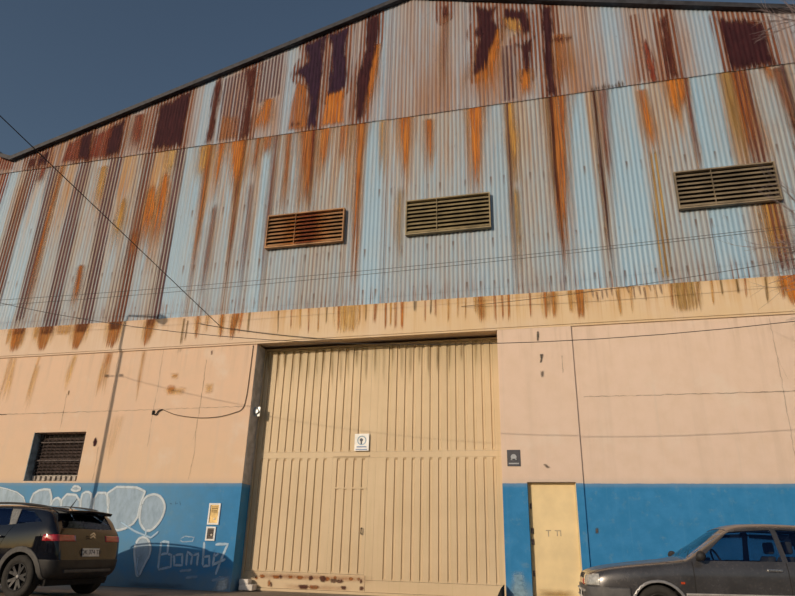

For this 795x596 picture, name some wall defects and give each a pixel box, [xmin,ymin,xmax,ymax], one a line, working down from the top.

corrosion [436,1,452,26]
corrosion [467,2,570,251]
corrosion [591,90,609,239]
corrosion [630,9,694,132]
corrosion [710,10,795,163]
corrosion [0,88,195,382]
corrosion [220,312,251,337]
corrosion [291,302,403,331]
corrosion [568,286,646,317]
corrosion [651,153,699,309]
corrosion [763,203,795,302]
corrosion [256,575,363,590]